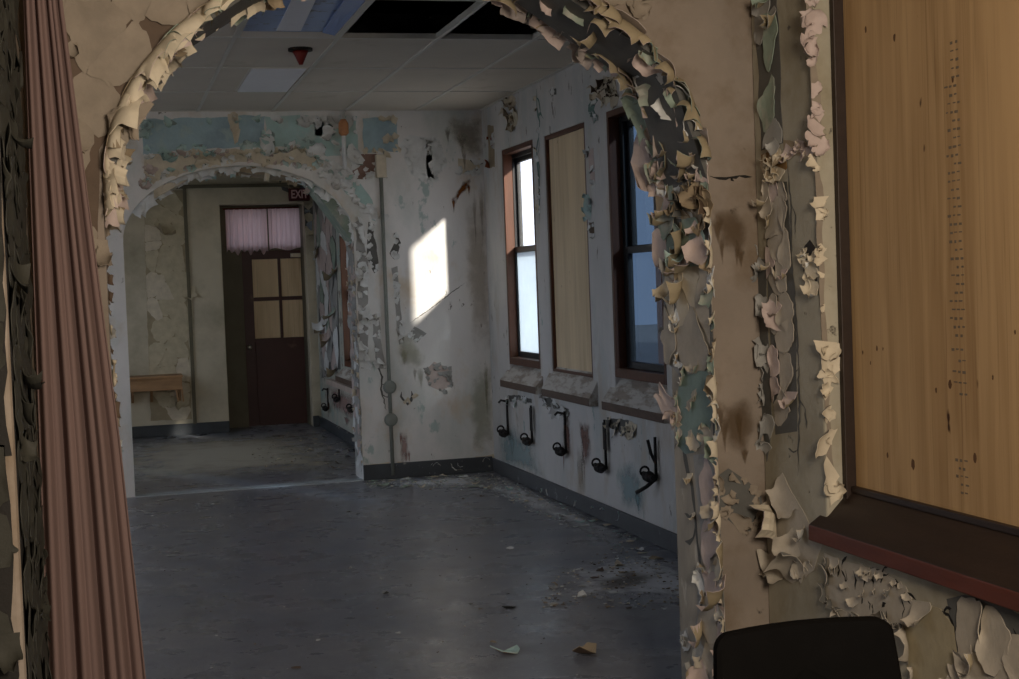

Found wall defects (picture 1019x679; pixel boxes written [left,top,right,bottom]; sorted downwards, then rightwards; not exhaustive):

peeling [63,0,448,467]
peeling [423,362,453,394]
peeling [482,0,1019,679]